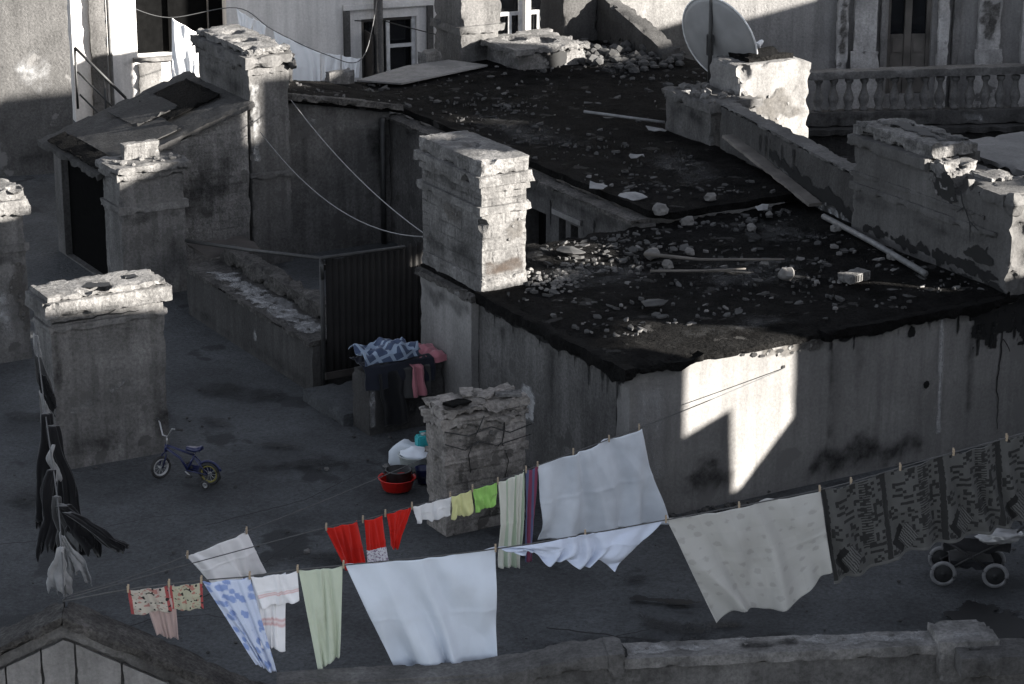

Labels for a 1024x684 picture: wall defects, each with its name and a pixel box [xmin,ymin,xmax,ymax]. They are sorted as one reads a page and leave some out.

spalling [929,170,957,204]
spalling [863,224,998,282]
crack [996,333,1010,429]
crack [492,422,509,481]